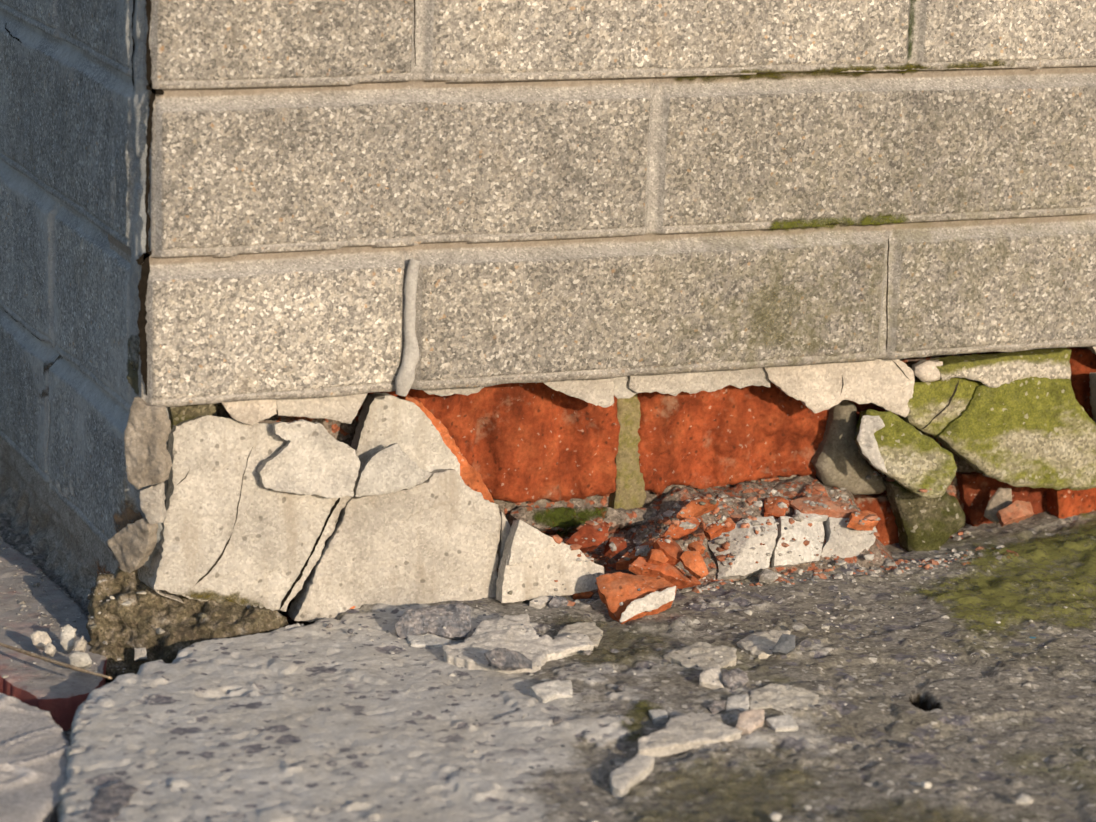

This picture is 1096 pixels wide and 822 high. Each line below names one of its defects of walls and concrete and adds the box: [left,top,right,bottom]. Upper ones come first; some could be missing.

crack [132,0,164,395]
spalling [1066,347,1096,421]
crack [196,450,252,584]
peeling [257,419,360,498]
crack [279,498,340,610]
peeling [529,595,551,609]
spalling [367,358,915,566]
spalling [957,472,1096,527]